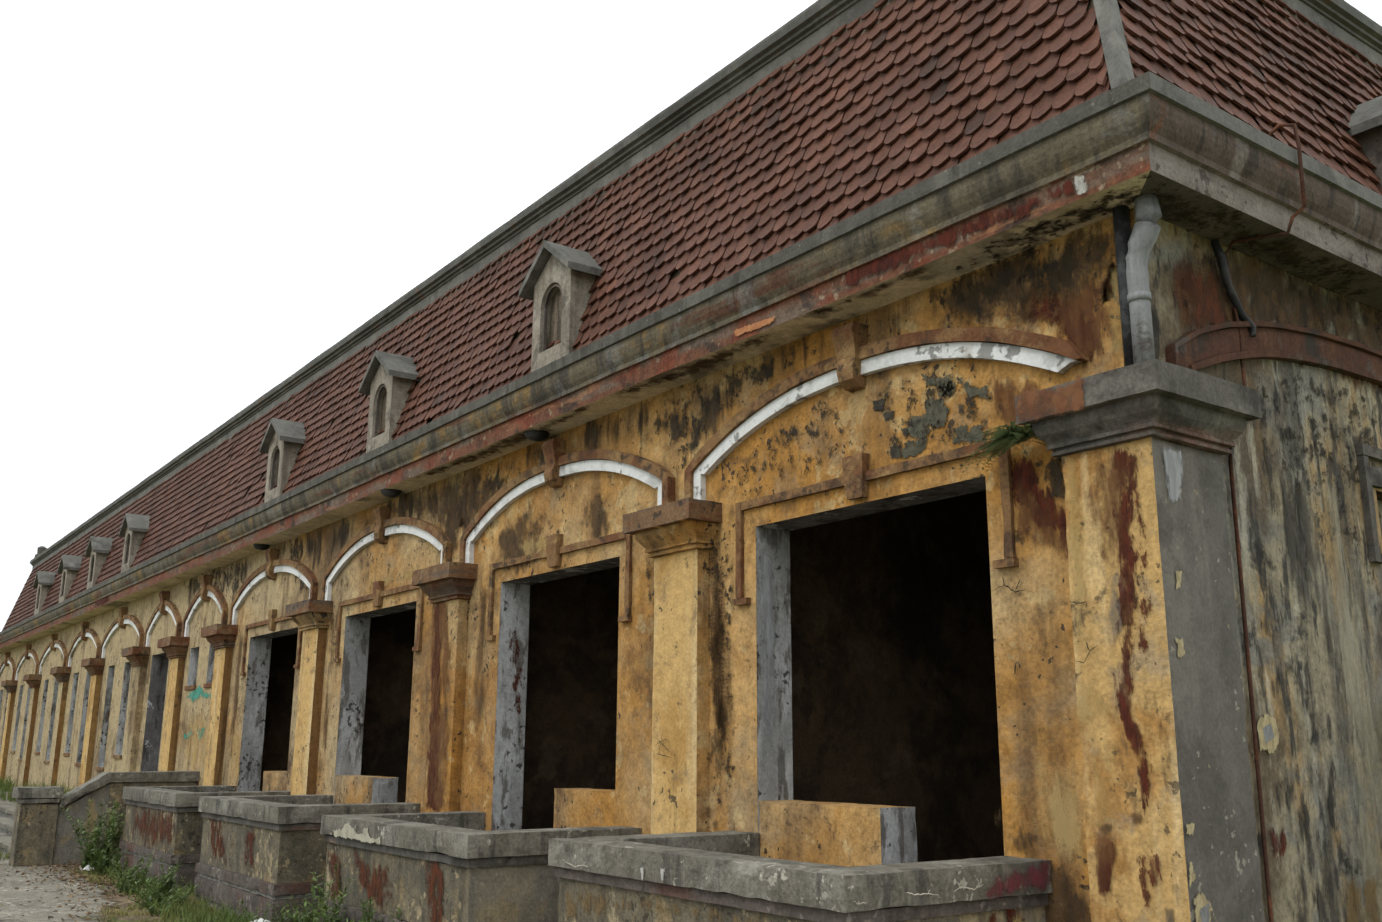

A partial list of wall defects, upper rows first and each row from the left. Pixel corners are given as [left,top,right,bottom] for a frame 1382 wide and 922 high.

water stain [814,268,923,314]
water stain [930,175,1382,349]
spalling [873,373,989,459]
corrosion [1010,456,1068,555]
water stain [1249,374,1377,657]
water stain [712,530,735,793]
corrosion [1089,448,1152,816]
water stain [1279,683,1379,922]
corrosion [424,861,444,922]
corrosion [1095,835,1115,896]
corrosion [1136,853,1162,907]
peeling [1189,862,1217,922]